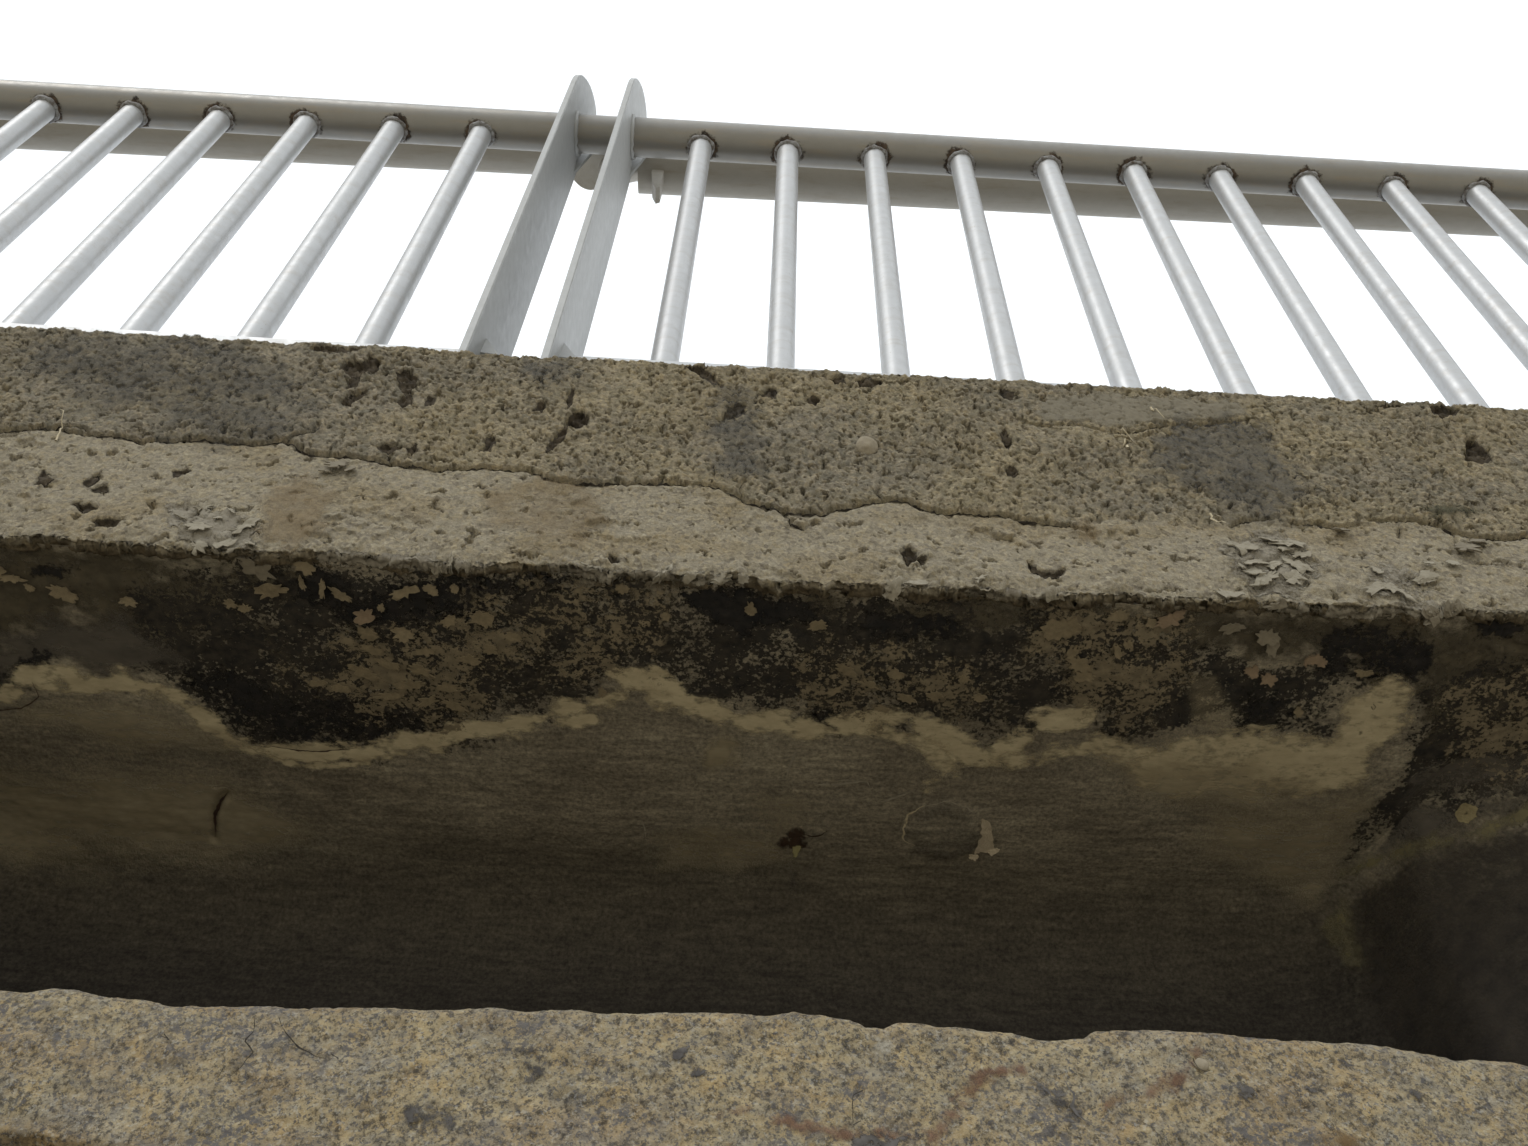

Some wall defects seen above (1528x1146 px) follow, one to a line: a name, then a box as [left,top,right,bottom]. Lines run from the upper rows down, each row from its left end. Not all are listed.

crack [0,424,1092,539]
spalling [882,547,929,602]
peeling [962,528,1488,734]
damp [0,557,1528,1066]